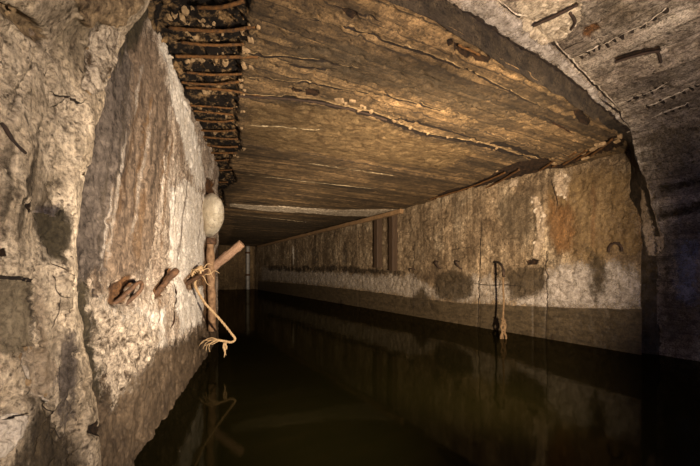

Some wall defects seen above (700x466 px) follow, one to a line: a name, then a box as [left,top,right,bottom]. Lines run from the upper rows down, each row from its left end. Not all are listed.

crack [49,91,87,108]
leakage [15,8,219,466]
rust [85,22,178,306]
spalling [154,0,405,217]
crack [238,47,560,165]
crack [300,4,572,134]
leakage [258,245,661,355]
rust [549,167,641,262]